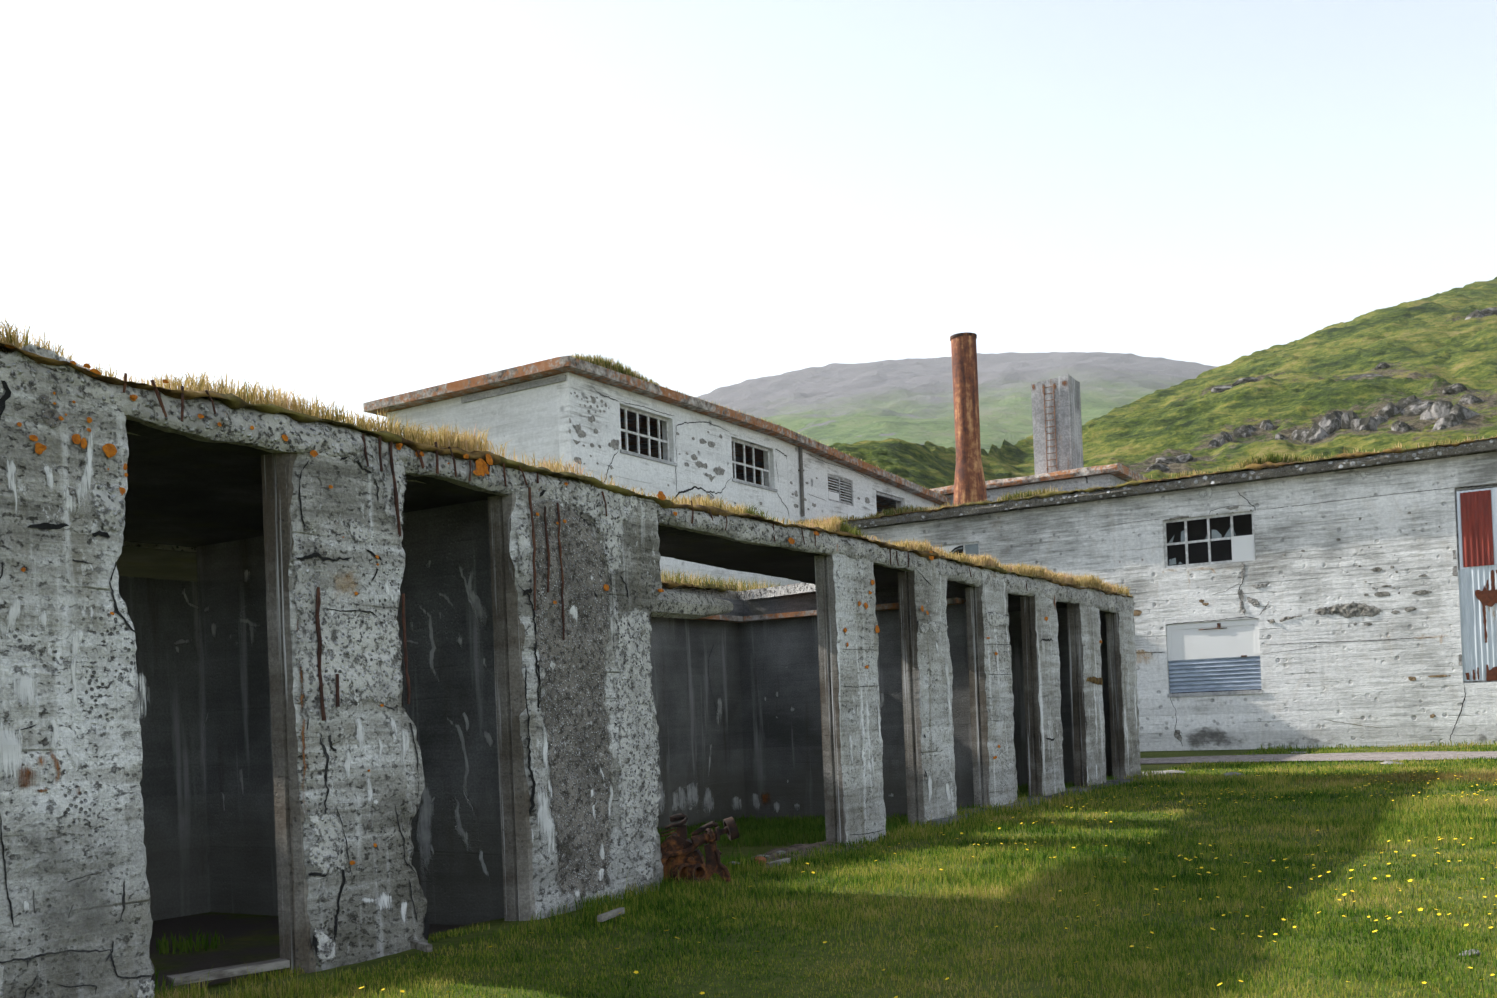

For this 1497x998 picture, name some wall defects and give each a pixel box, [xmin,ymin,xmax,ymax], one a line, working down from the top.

crack [0,380,11,419]
crack [594,389,732,501]
crack [776,449,868,518]
crack [28,523,136,633]
spalling [1238,546,1432,626]
rust [1475,570,1497,643]